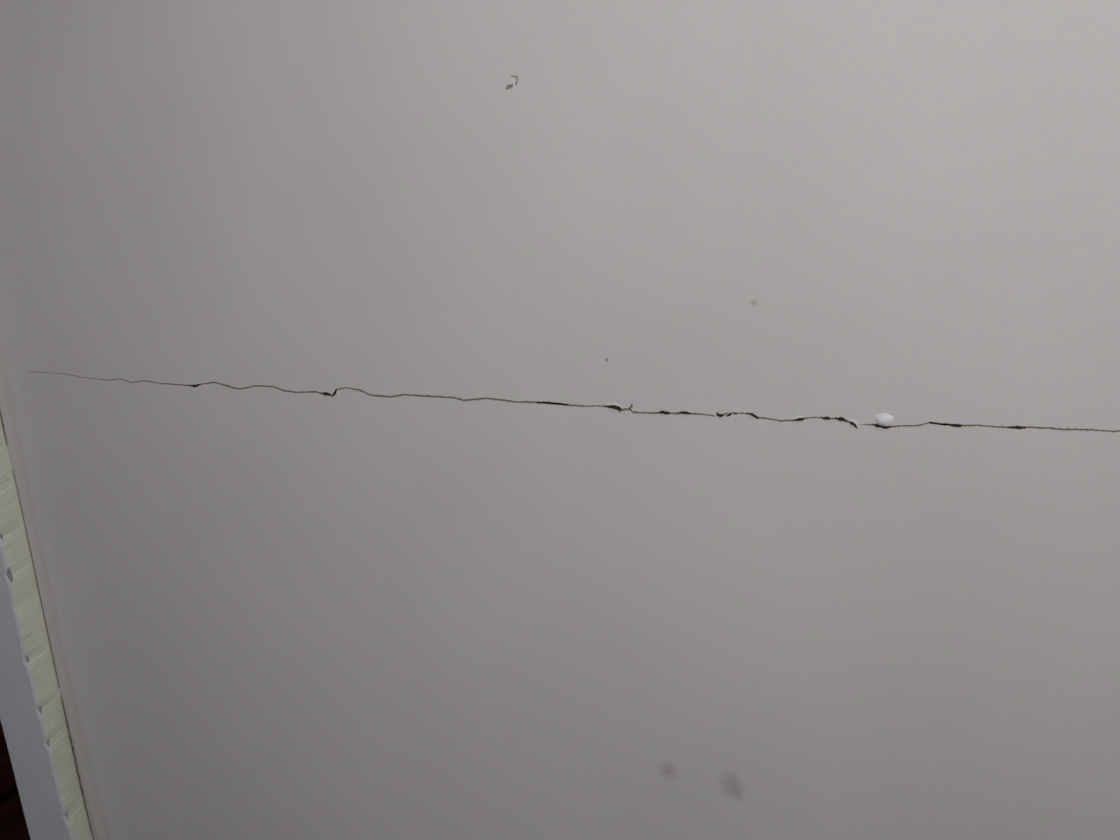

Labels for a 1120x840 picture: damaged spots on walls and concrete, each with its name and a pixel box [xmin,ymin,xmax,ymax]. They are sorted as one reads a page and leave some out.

crack [29,371,1120,432]